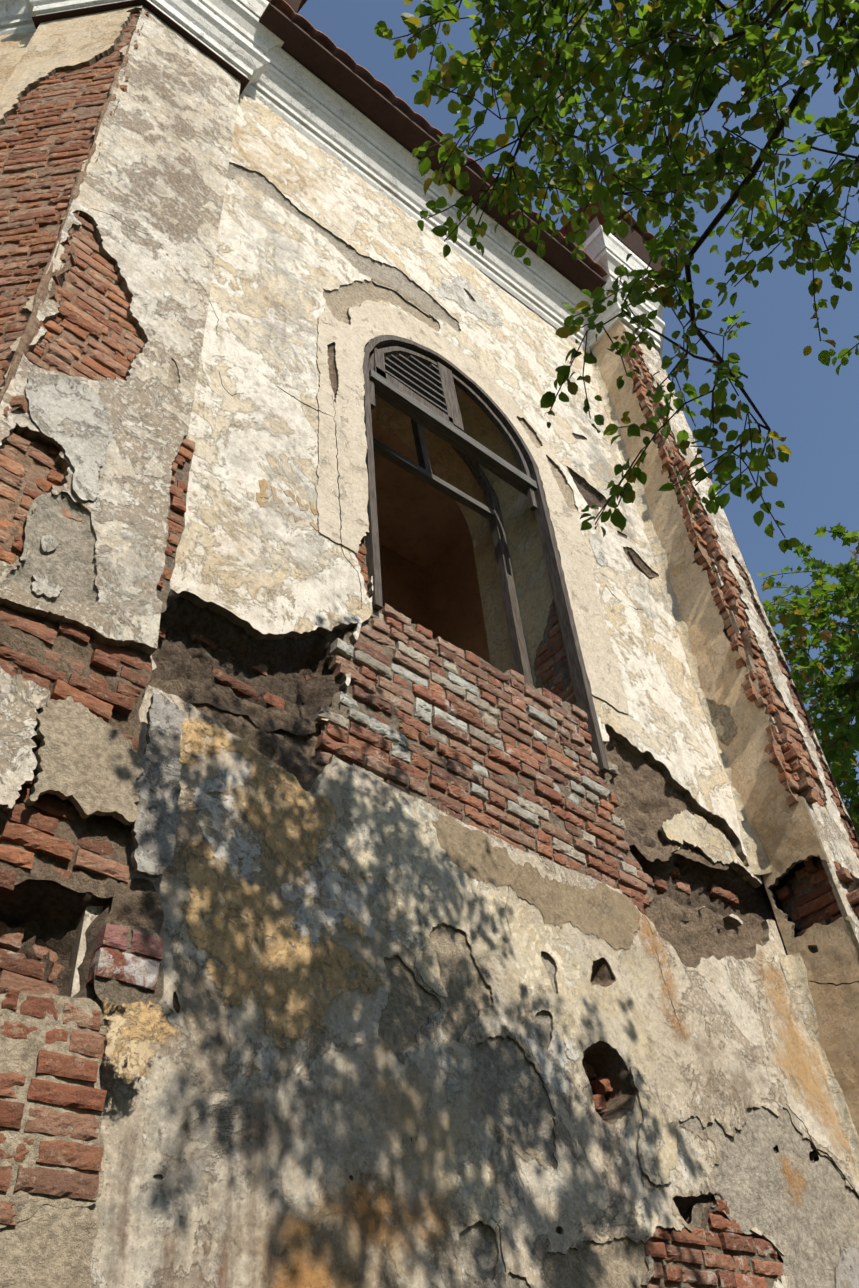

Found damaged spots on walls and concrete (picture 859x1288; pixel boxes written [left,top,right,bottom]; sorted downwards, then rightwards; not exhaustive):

flaking render [0,12,149,608]
spalling [0,438,859,1288]
spalling [604,341,859,967]